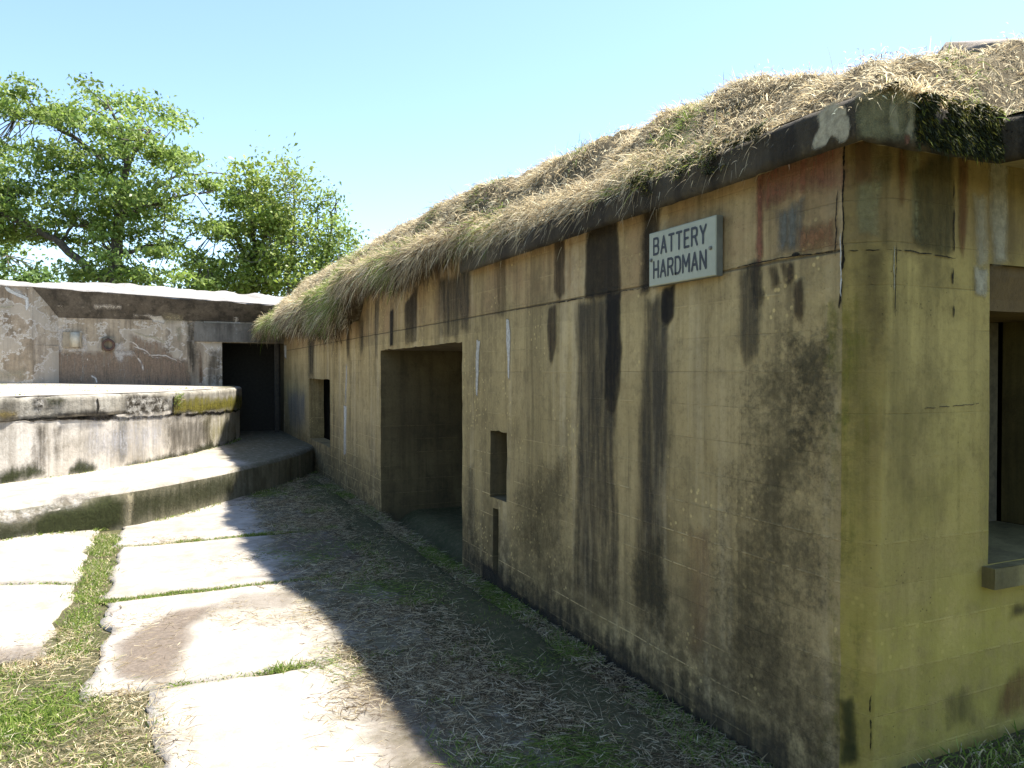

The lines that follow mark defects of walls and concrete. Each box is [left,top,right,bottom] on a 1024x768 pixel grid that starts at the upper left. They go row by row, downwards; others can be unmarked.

crack [737,146,956,317]
water stain [547,240,564,362]
water stain [742,263,802,356]
spalling [35,395,44,412]
peeling [59,330,190,418]
water stain [577,222,621,594]
water stain [632,208,674,624]